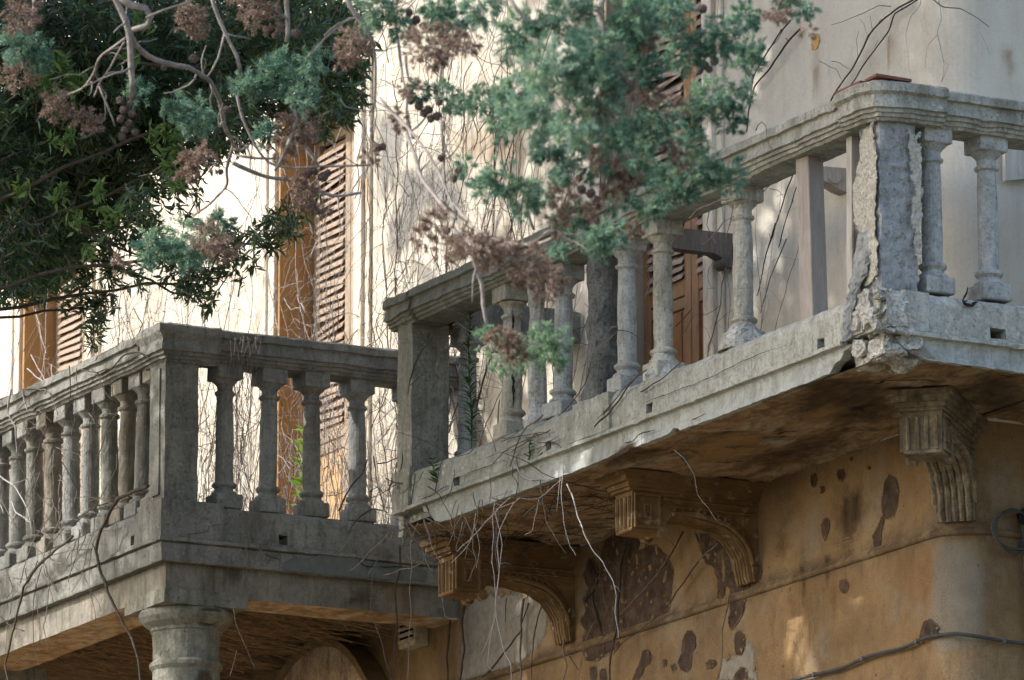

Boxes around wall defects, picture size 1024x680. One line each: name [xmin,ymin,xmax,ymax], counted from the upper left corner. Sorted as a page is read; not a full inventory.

spalling [840,122,935,374]
crack [509,310,517,408]
flaking render [872,475,899,548]
flaking render [580,533,674,680]
flaking render [632,630,696,680]
flaking render [694,532,763,680]
flaking render [917,619,939,638]